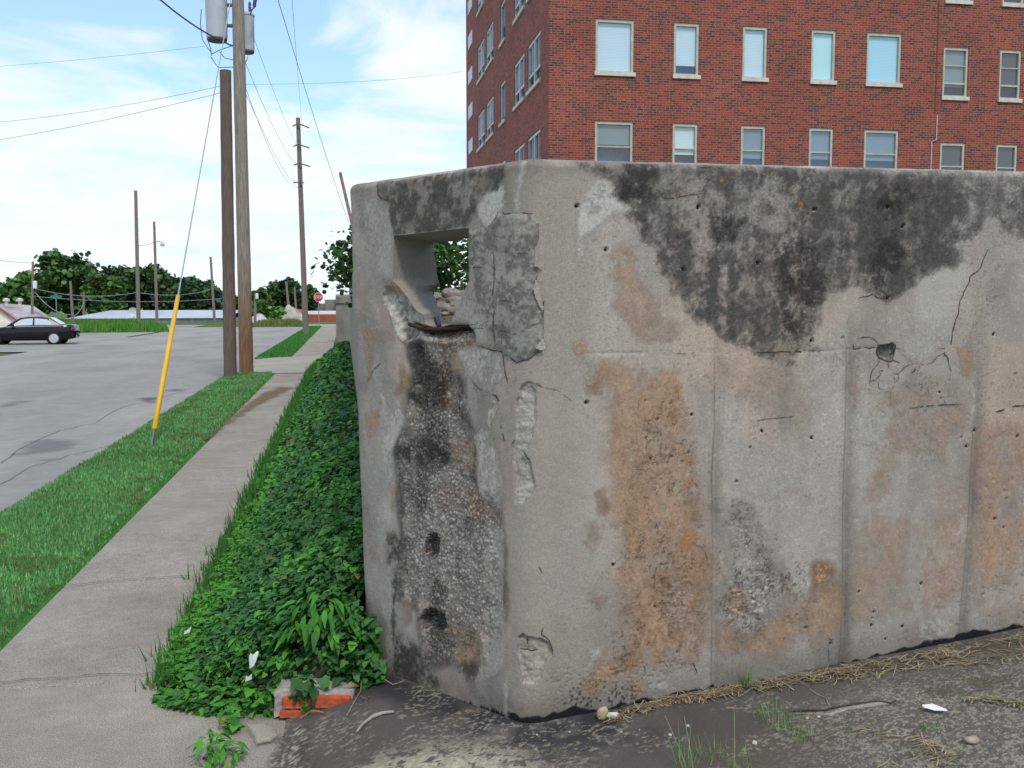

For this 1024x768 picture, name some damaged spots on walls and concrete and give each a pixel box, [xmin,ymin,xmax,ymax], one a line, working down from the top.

leakage [365,161,526,276]
leakage [576,164,1024,360]
crack [853,250,988,409]
spalling [383,282,507,667]
spalling [512,382,542,504]
corrosion [583,363,706,692]
spalling [517,634,552,685]